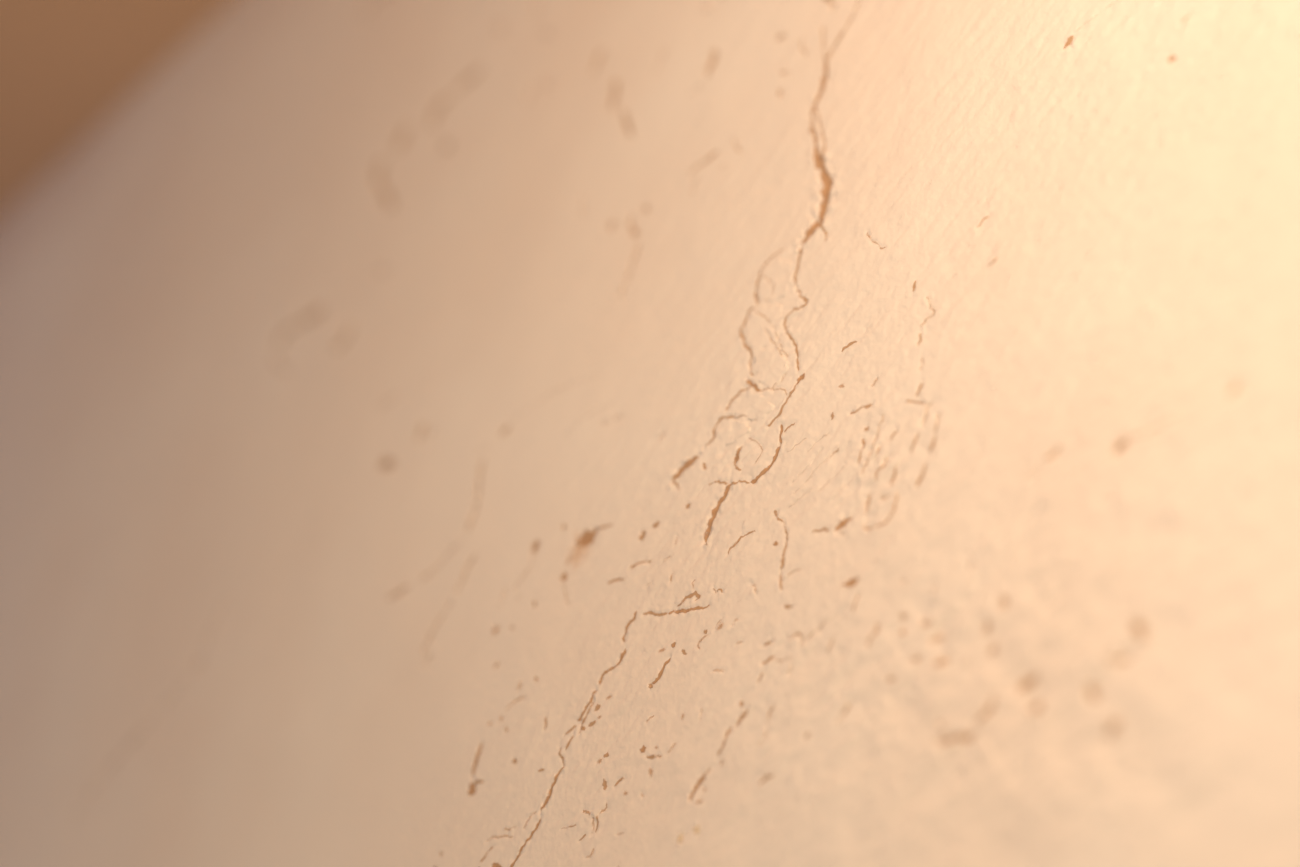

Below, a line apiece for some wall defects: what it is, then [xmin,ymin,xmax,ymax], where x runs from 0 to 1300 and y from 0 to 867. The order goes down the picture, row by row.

crack [783,0,860,371]
flaking render [673,250,805,543]
crack [773,510,792,609]
flaking render [812,517,852,533]
crack [481,591,709,867]
crack [690,700,748,802]